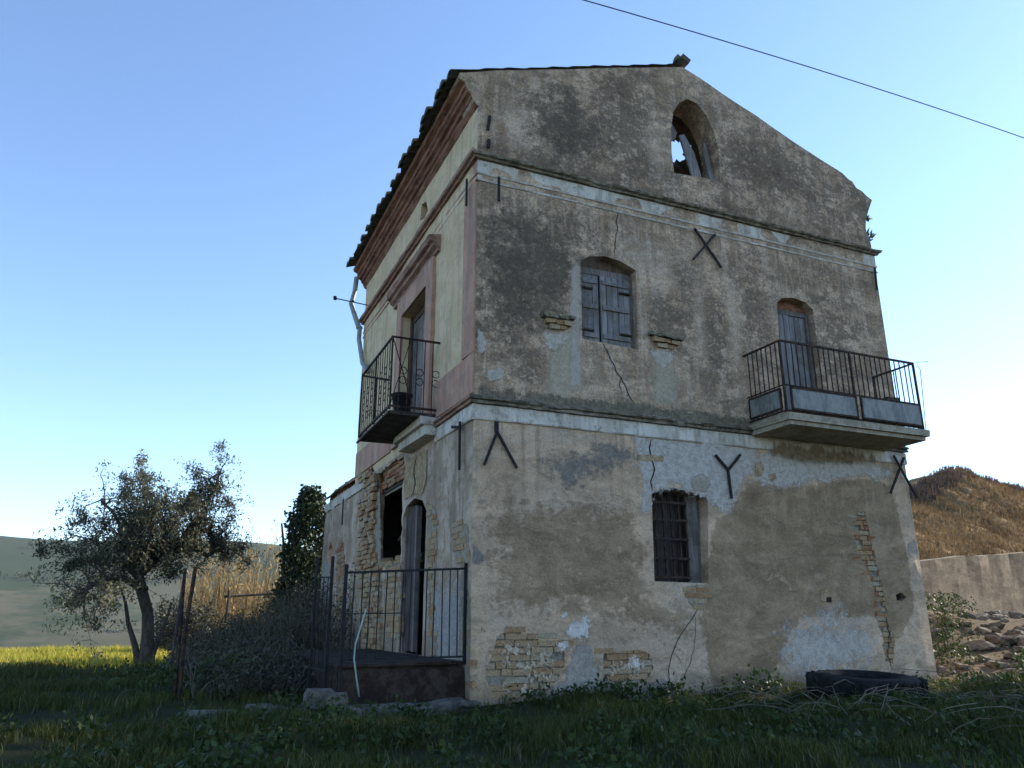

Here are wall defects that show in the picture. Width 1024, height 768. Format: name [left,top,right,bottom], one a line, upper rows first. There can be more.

peeling [542,311,573,352]
crack [603,344,632,400]
peeling [650,332,680,369]
crack [648,439,656,491]
flaking render [334,468,405,650]
flaking render [848,512,901,664]
flaking render [460,591,669,704]